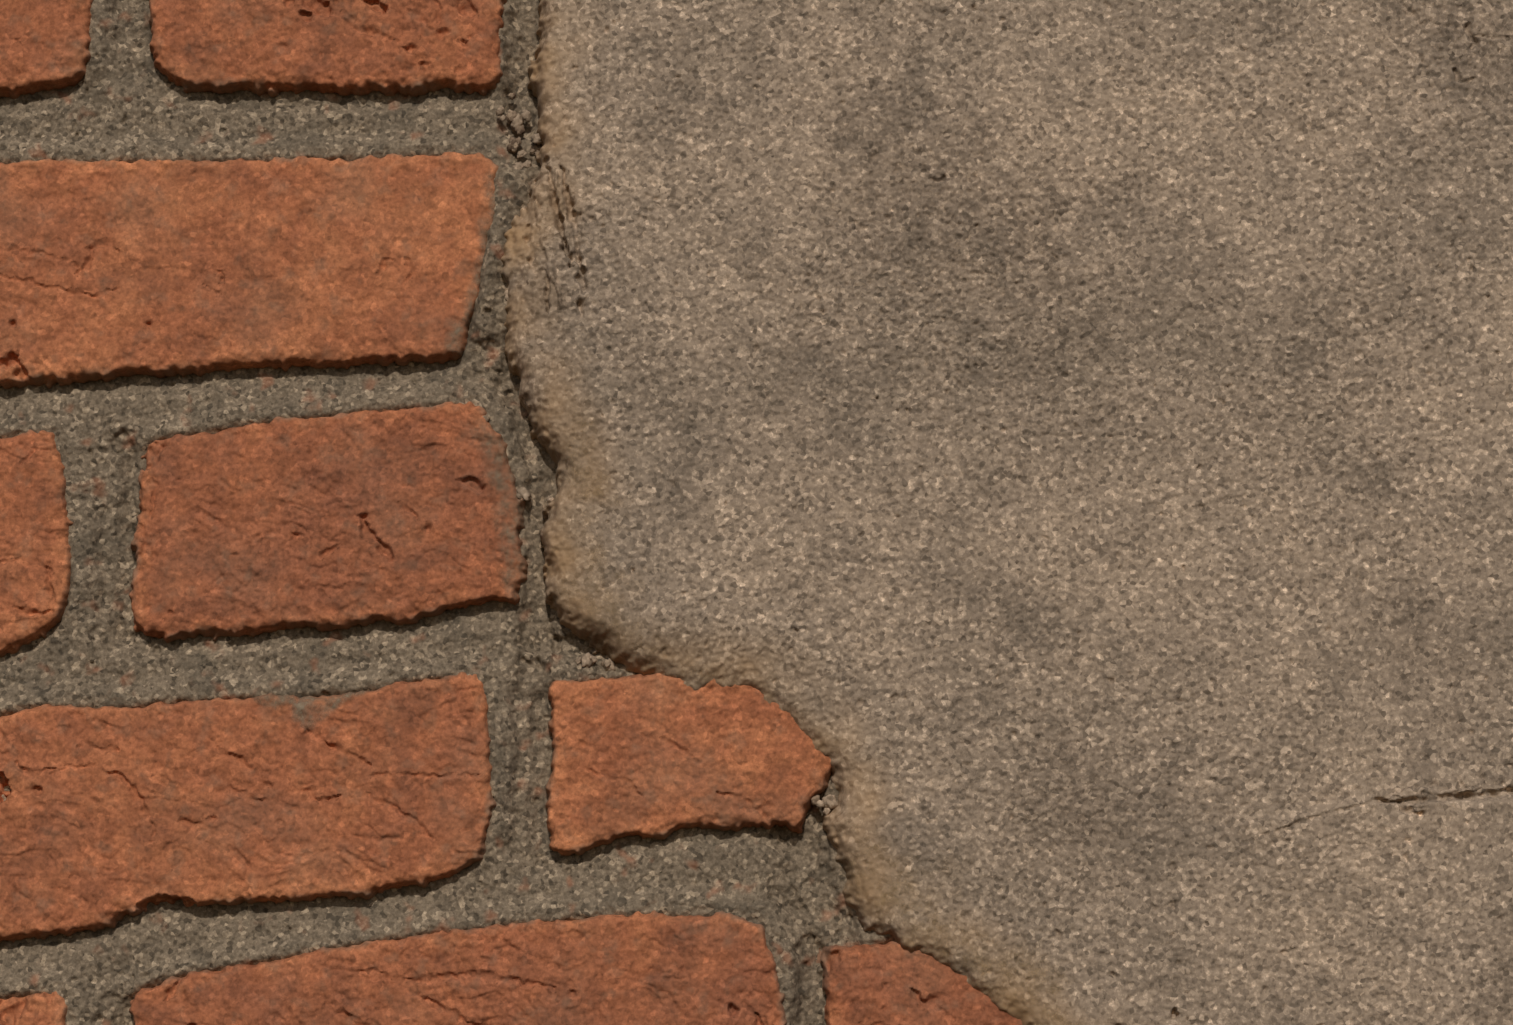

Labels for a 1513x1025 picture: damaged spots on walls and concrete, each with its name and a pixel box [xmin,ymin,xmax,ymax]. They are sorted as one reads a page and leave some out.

hole [283,0,479,74]
spalling [496,93,543,186]
spalling [0,350,49,389]
hole [455,475,488,495]
hole [356,513,395,562]
spalling [575,652,615,671]
hole [0,760,57,804]
spalling [811,794,838,815]
crack [1259,761,1513,838]
peeling [134,893,208,915]
peeling [0,991,61,1025]
spalling [909,988,956,1021]